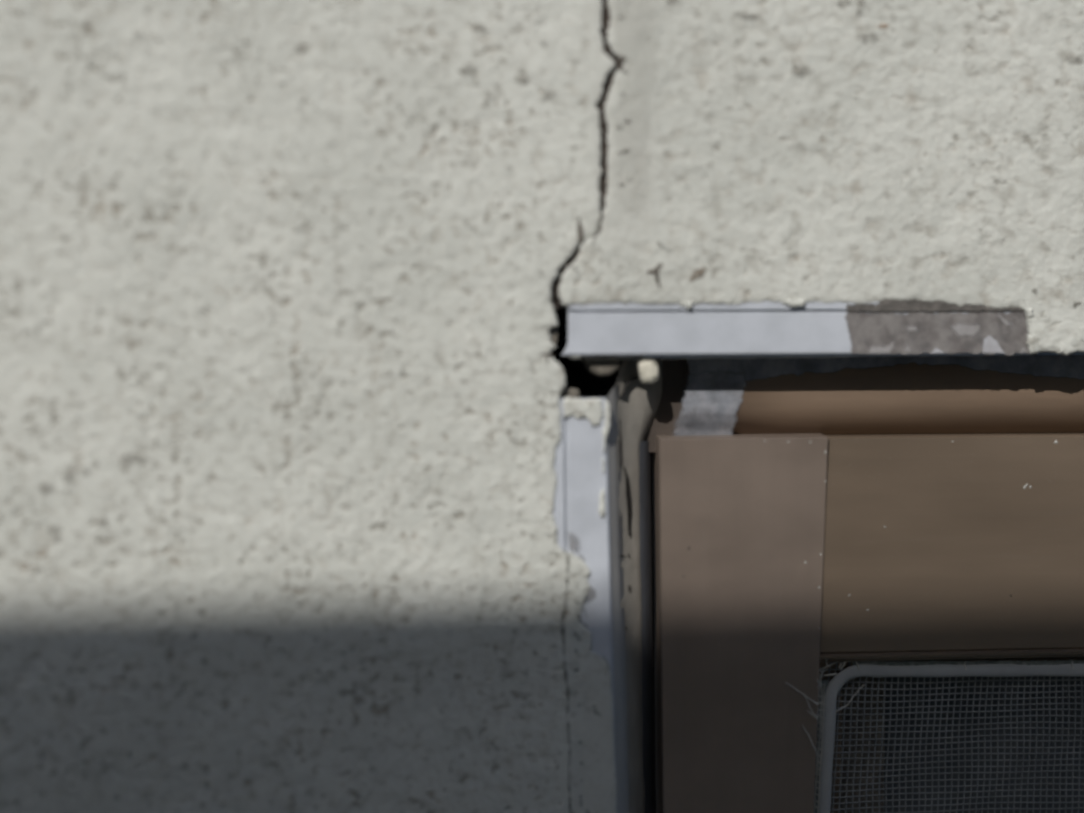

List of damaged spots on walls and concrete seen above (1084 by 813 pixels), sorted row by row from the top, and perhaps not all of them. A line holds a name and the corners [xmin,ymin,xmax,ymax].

crack [550,0,627,308]